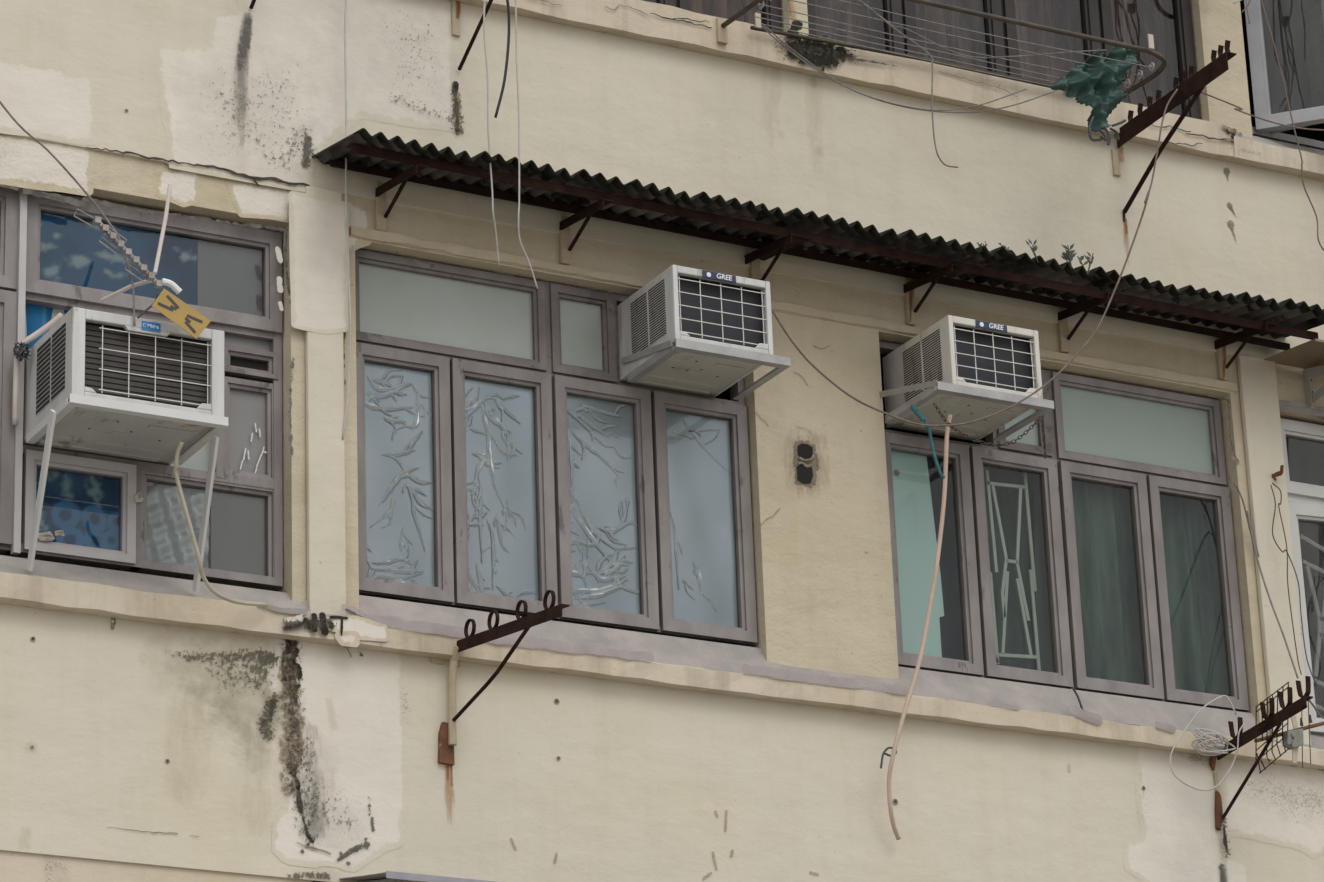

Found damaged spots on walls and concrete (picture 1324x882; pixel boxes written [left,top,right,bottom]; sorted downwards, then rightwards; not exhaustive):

damp [237,13,252,109]
damp [301,134,327,170]
mould [165,612,348,847]
damp [1219,817,1232,882]